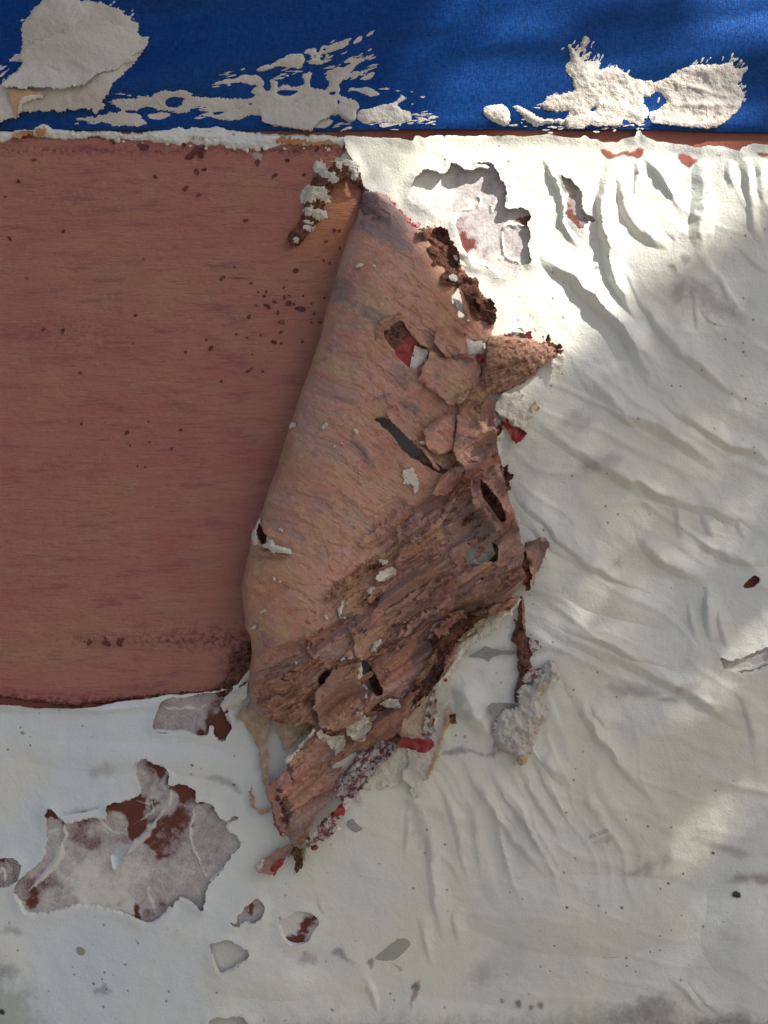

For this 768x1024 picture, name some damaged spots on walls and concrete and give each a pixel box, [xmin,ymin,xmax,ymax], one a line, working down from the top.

flaking render [483,104,511,126]
peeling [144,163,565,876]
peeling [720,647,768,673]
peeling [0,760,241,926]
peeling [232,899,265,926]
peeling [278,911,319,946]